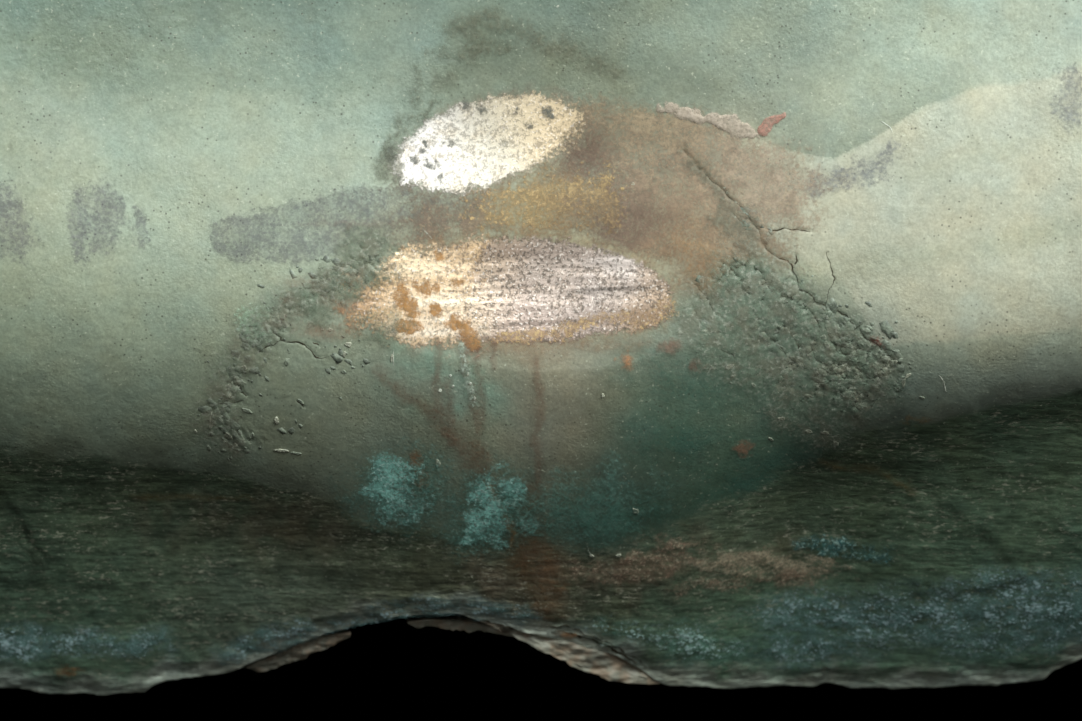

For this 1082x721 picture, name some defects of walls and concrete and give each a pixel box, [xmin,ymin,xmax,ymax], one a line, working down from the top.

spalling [410,140,443,183]
crack [688,155,891,389]